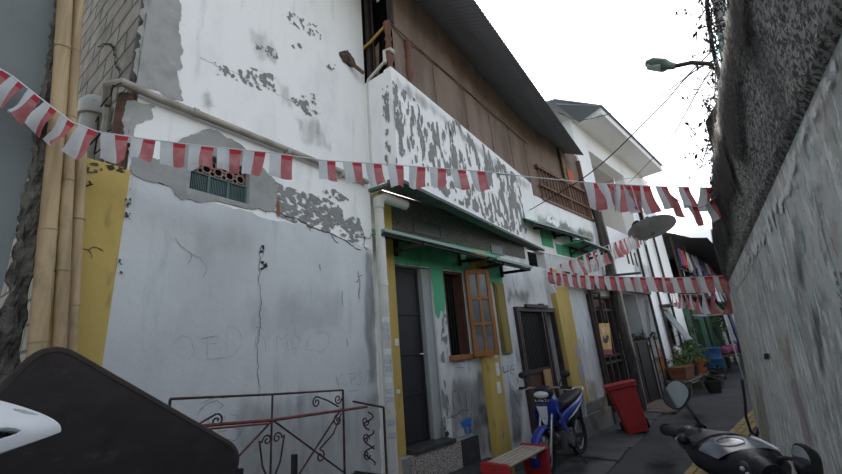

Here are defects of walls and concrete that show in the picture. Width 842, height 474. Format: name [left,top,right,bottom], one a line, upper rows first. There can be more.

spalling [36,0,57,108]
flaking render [122,100,155,143]
flaking render [133,0,184,101]
peeling [214,62,276,92]
peeling [287,11,321,40]
peeling [291,93,318,116]
peeling [382,80,527,235]
peeling [276,182,366,243]
spalling [0,121,48,384]